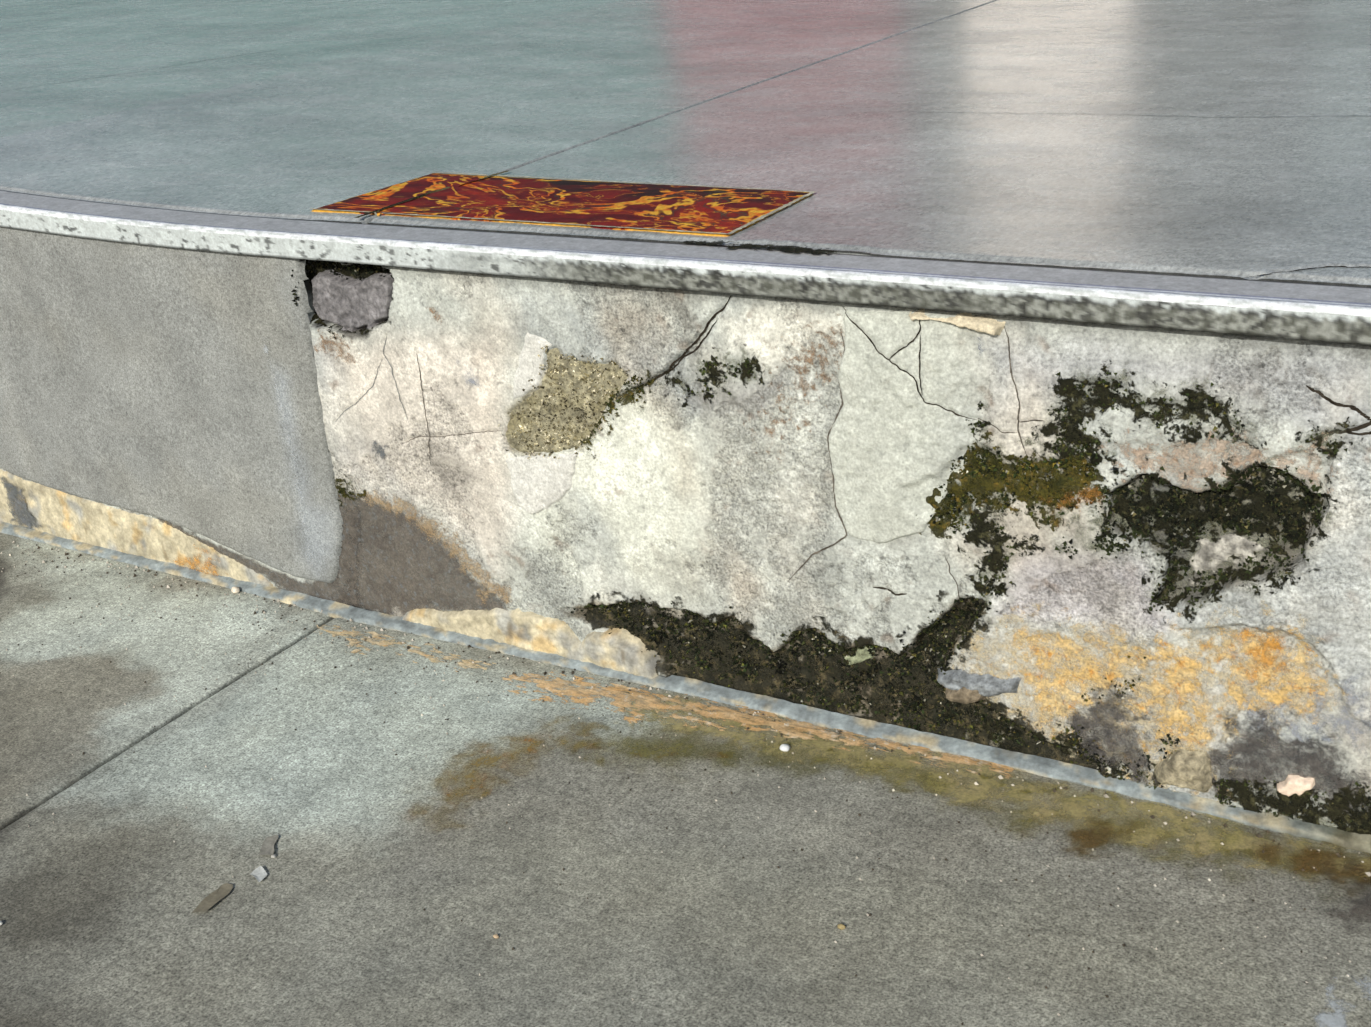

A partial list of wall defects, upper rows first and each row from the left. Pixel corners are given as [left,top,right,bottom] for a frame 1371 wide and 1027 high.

spalling [291,260,394,339]
crack [334,336,493,465]
crack [632,296,731,392]
crack [844,308,1043,453]
crack [1244,266,1371,278]
crack [1306,385,1371,443]
damp [158,492,510,615]
spalling [1055,429,1347,624]
spalling [571,584,1115,778]
corrosion [971,610,1349,787]
damp [317,625,1371,921]
spalling [1277,774,1315,797]